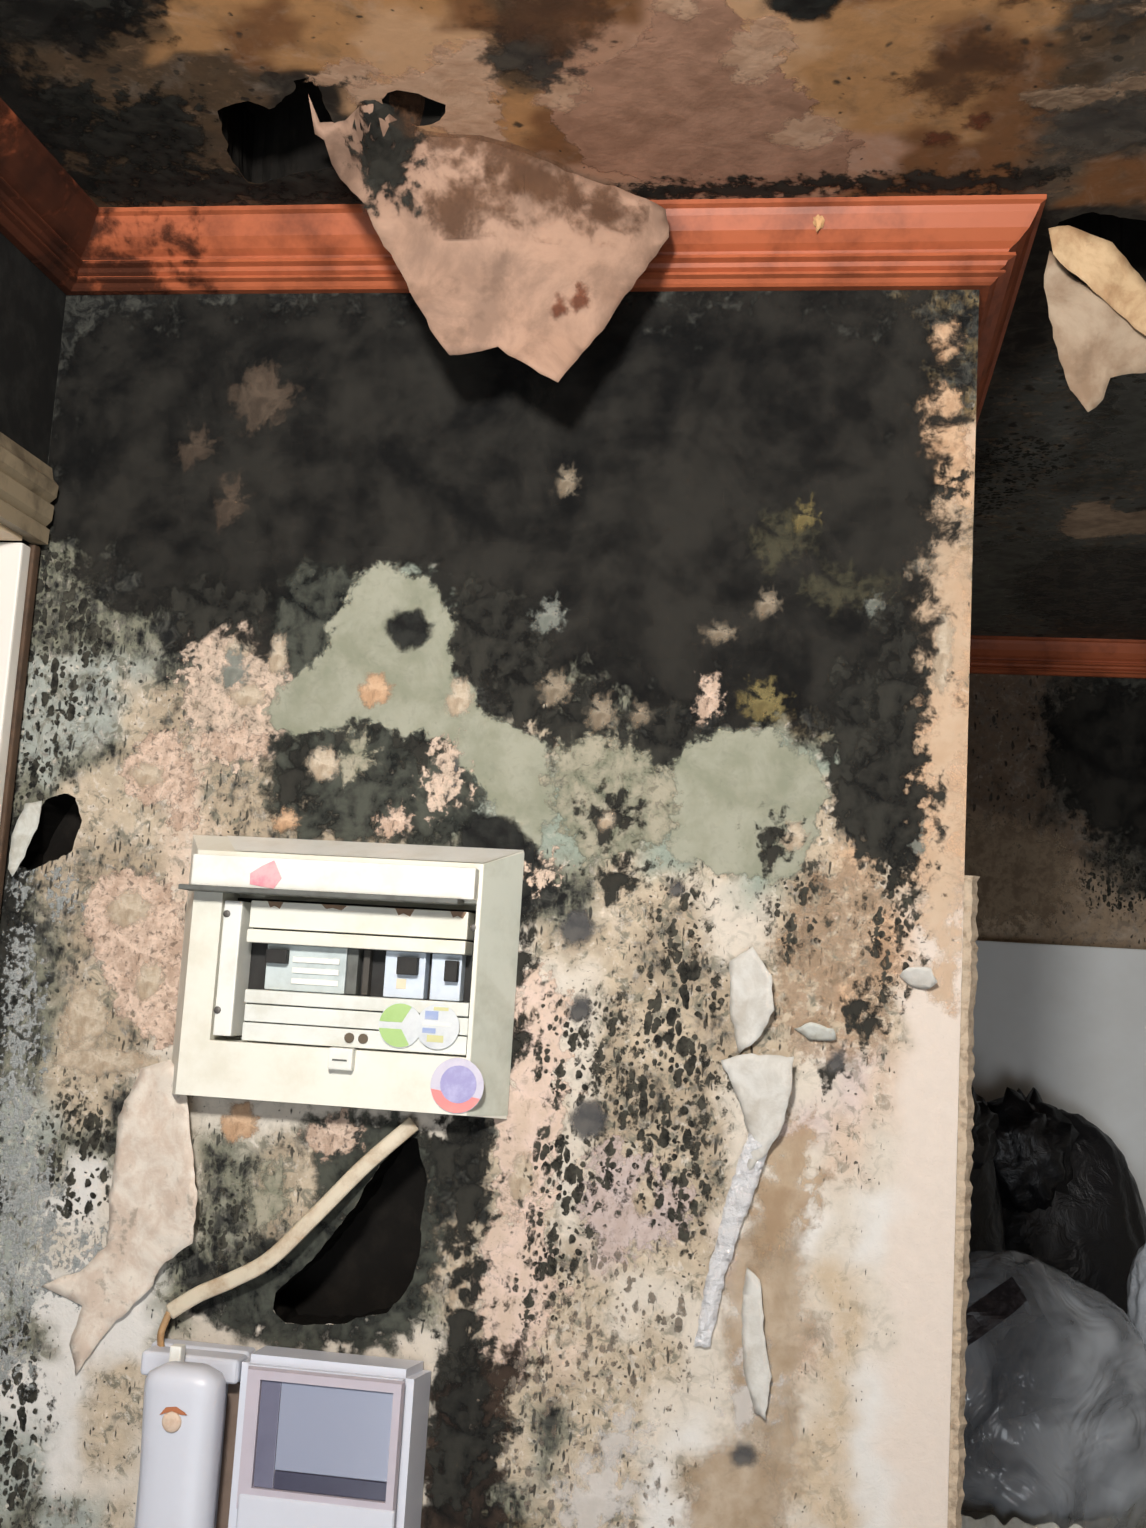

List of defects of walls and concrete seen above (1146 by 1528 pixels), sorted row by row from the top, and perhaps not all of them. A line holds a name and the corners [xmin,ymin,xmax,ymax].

peeling [307,39,507,142]
water stain [0,0,1146,1038]
water stain [36,1082,116,1231]
spalling [0,794,184,1396]
spalling [297,1108,366,1162]
spalling [273,1137,431,1325]
water stain [197,717,738,1528]
water stain [828,1053,843,1072]
water stain [0,1307,61,1528]